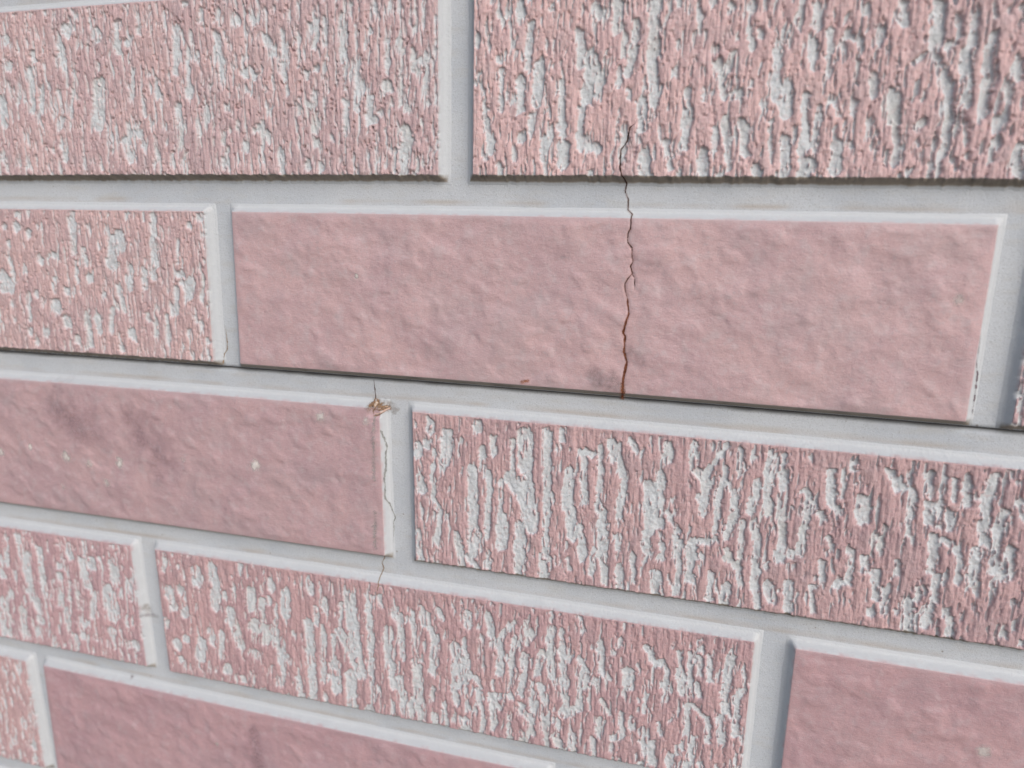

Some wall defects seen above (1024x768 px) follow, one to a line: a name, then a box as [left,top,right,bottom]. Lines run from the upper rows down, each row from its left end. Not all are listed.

crack [619,124,635,398]
crack [372,384,396,591]